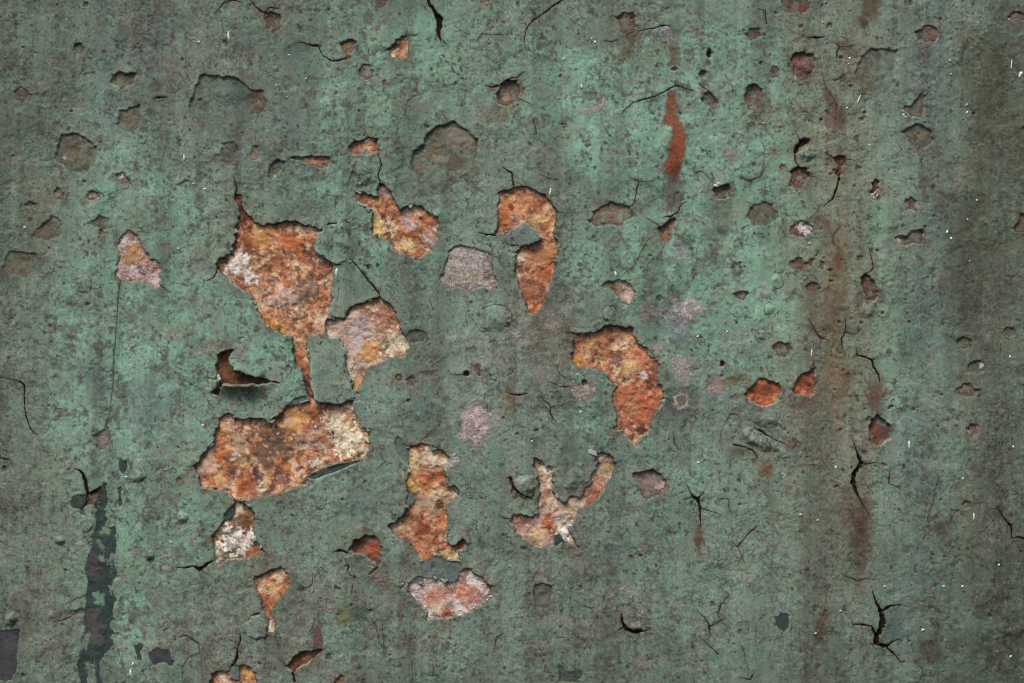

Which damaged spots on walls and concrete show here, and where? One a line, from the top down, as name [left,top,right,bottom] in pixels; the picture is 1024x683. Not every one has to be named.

crack [379,0,446,49]
rust [663,91,686,208]
peeling [356,185,439,258]
peeling [496,187,560,314]
peeling [196,195,425,566]
peeling [571,326,666,446]
water stain [77,483,122,683]
peeling [244,569,289,640]
peeling [389,437,492,622]
peeling [512,449,615,547]
crack [814,576,923,683]
crack [850,434,899,515]